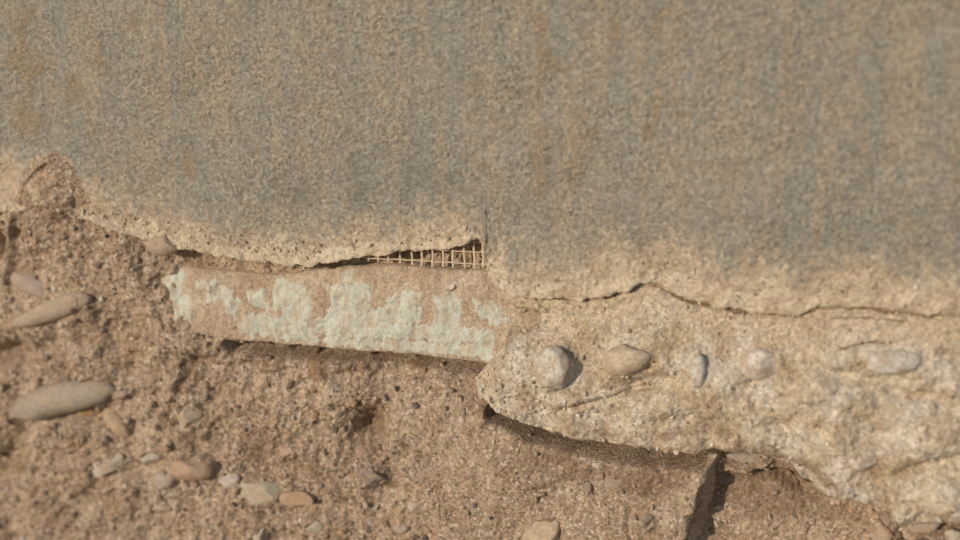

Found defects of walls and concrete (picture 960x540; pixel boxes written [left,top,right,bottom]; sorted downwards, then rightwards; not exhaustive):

peeling [80,214,960,362]
crack [536,284,960,352]
spalling [688,448,775,540]